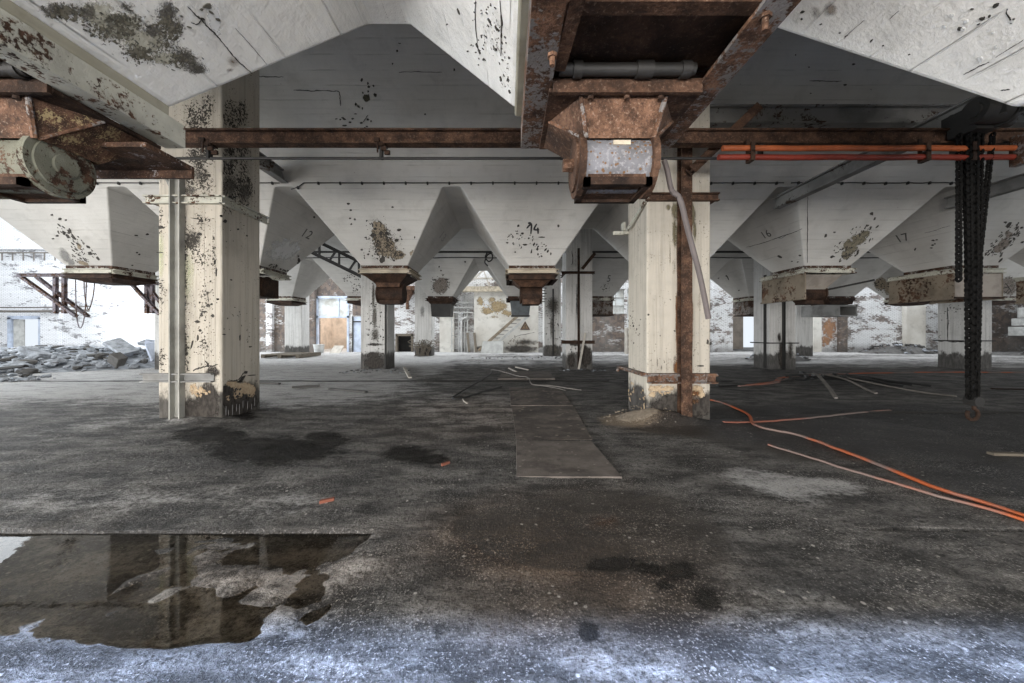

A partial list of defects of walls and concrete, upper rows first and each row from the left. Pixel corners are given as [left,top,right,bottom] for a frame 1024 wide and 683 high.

damp [41,2,208,74]
crack [187,6,265,74]
damp [178,89,258,128]
damp [182,148,258,214]
spalling [185,367,258,417]
spalling [628,382,677,412]
spalling [692,385,710,418]